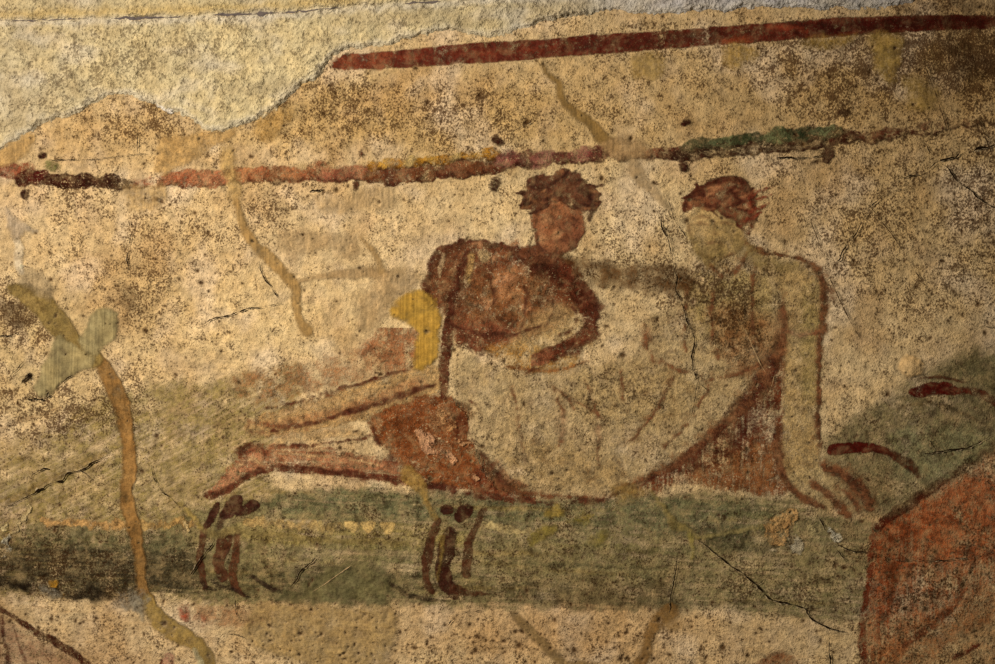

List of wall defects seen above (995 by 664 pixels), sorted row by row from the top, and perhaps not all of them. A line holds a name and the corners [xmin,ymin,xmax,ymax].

crack [543,68,715,413]
crack [826,136,995,266]
crack [5,198,406,664]
crack [651,485,845,664]